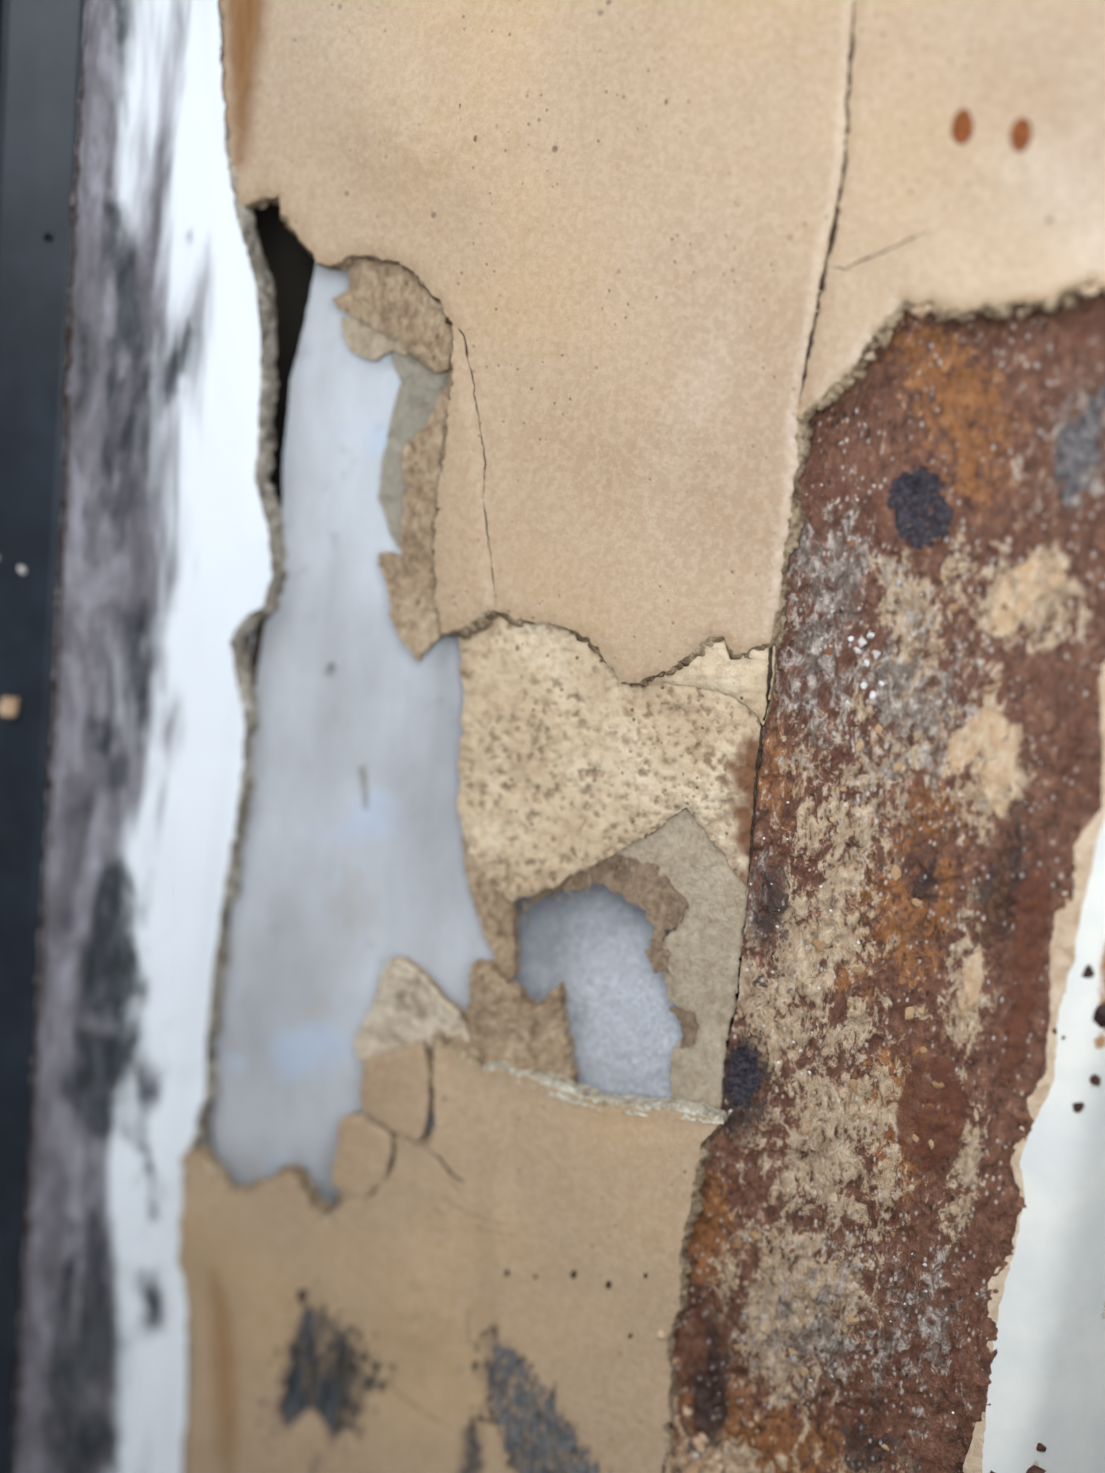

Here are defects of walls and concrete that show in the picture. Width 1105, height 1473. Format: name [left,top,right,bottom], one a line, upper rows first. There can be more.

crack [799,0,927,408]
rust [952,110,973,143]
rust [1011,118,1031,152]
crack [458,328,496,606]
flaking render [331,257,777,1196]
rust [657,277,1105,1473]
crack [356,1109,464,1198]
damp [260,1282,395,1444]
damp [463,1321,599,1473]